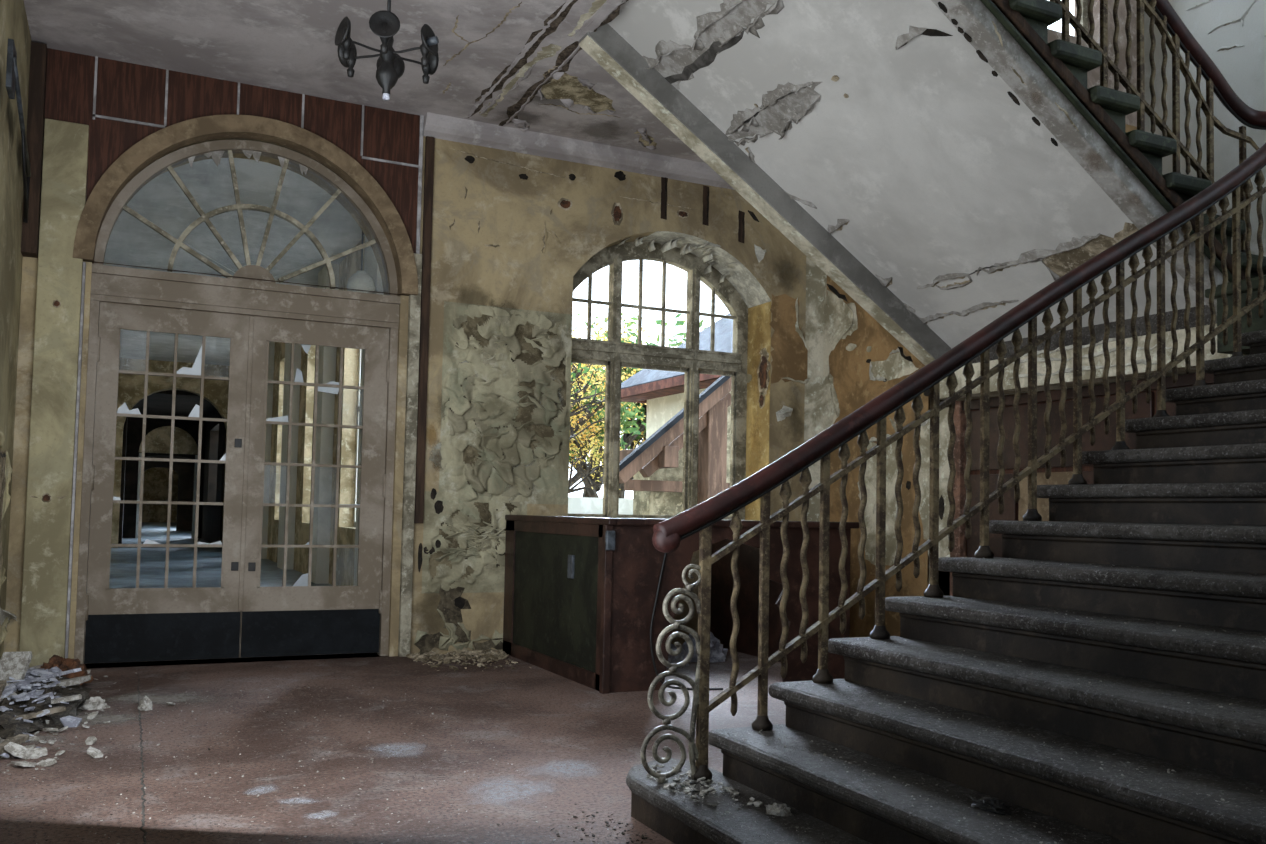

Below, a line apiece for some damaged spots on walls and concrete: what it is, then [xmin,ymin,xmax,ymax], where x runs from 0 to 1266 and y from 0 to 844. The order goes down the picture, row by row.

peeling [642,0,784,90]
peeling [895,2,998,77]
peeling [725,75,839,146]
peeling [757,284,919,431]
flaking render [431,488,444,514]
flaking render [418,540,441,573]
crack [137,673,148,844]